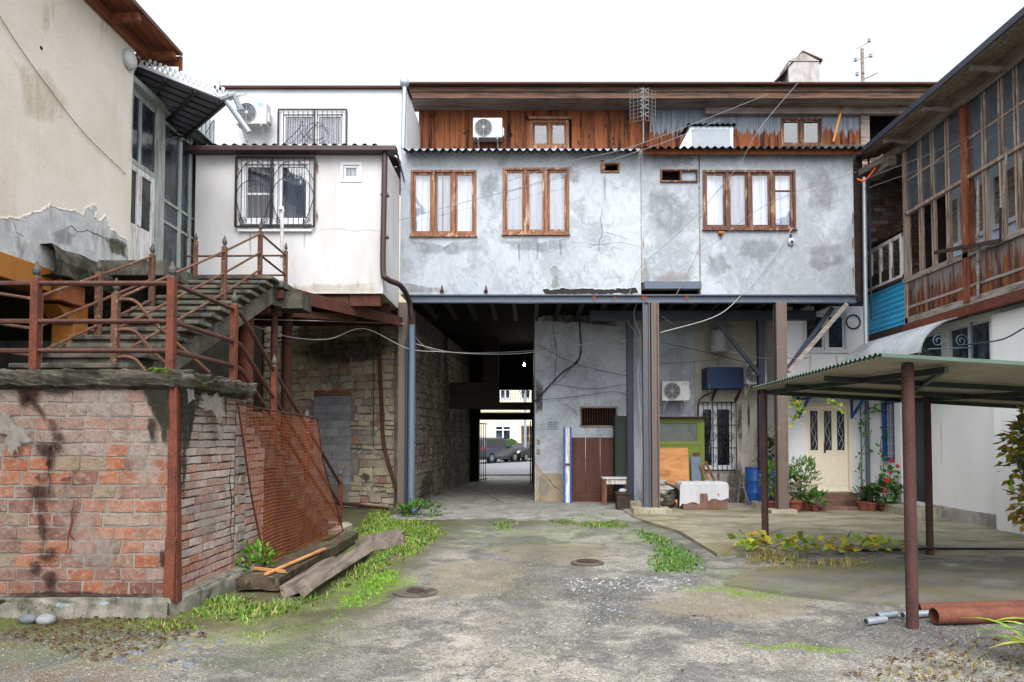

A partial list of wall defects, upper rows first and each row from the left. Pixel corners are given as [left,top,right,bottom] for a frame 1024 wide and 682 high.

flaking render [0,202,128,268]
leakage [16,387,72,588]